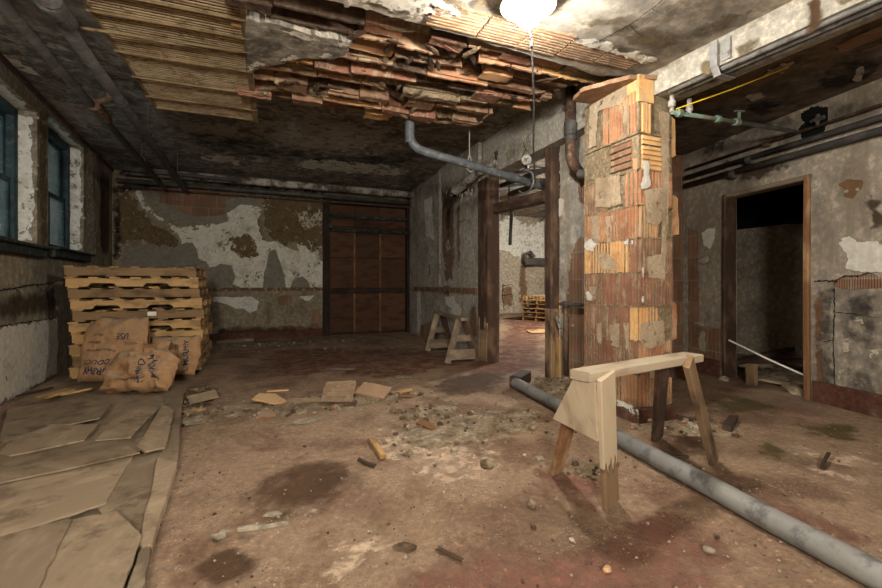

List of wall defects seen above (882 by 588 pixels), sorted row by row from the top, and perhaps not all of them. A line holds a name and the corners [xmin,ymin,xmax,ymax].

peeling [344,0,461,22]
peeling [574,38,658,64]
peeling [112,186,323,313]
spalling [566,236,594,380]
crack [814,272,877,385]
peeling [832,236,882,290]